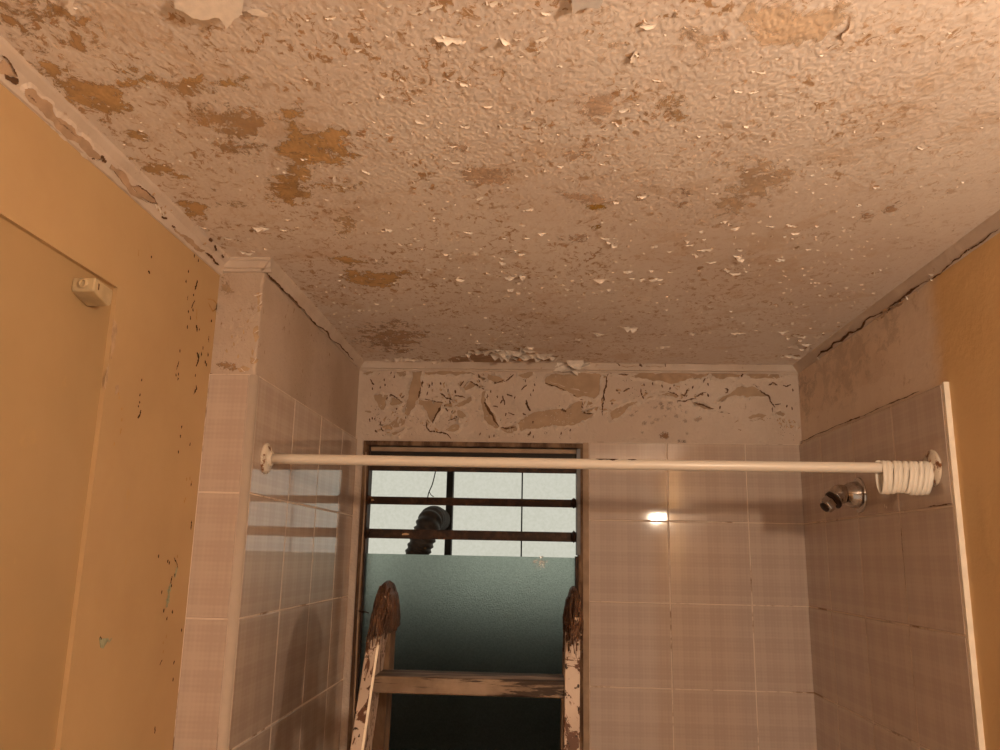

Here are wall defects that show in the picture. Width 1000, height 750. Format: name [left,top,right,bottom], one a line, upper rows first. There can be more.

peeling [174,0,269,29]
peeling [434,35,466,46]
peeling [480,37,523,57]
peeling [635,11,678,30]
flaking render [0,56,255,265]
peeling [683,219,748,276]
peeling [751,216,819,250]
peeling [481,250,541,294]
peeling [554,269,673,292]
crack [817,230,997,357]
crack [267,273,353,360]
flaking render [362,334,800,440]